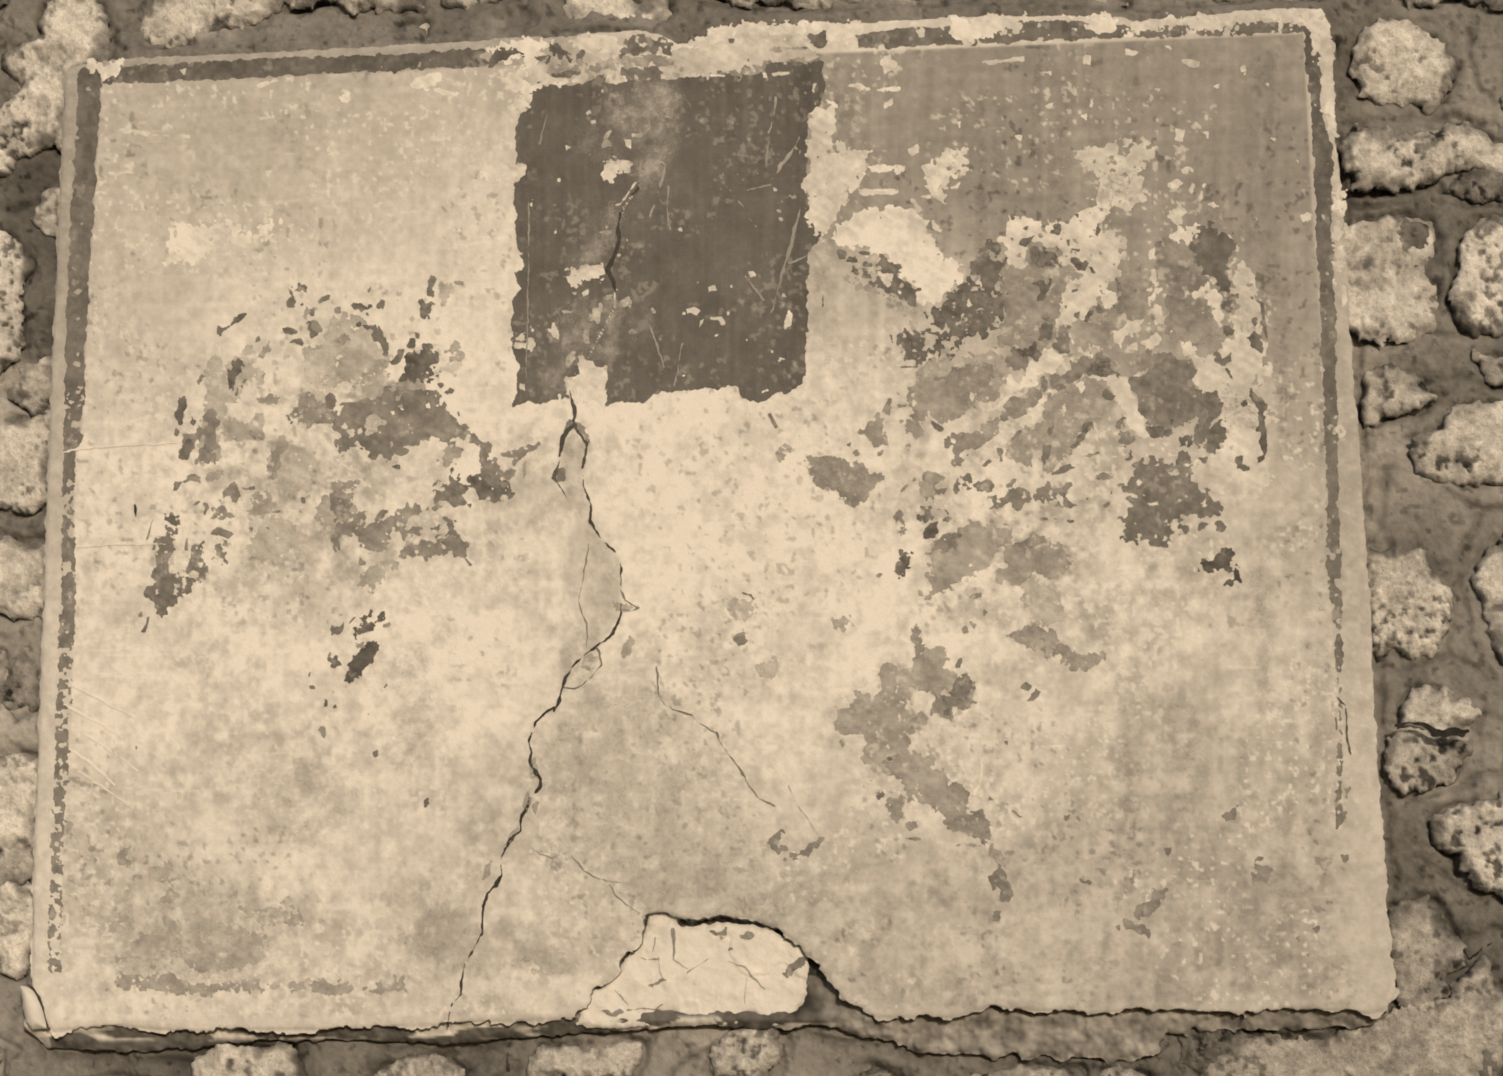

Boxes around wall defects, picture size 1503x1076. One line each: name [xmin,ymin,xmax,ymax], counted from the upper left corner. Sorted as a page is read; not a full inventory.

peeling [485,18,901,118]
peeling [947,11,1029,44]
peeling [1047,8,1340,138]
peeling [586,110,642,206]
crack [605,183,639,304]
peeling [1331,182,1348,307]
peeling [514,254,632,411]
peeling [138,275,541,708]
crack [447,391,818,1027]
peeling [834,623,1014,921]
peeling [105,861,410,998]
flaking render [576,913,810,1029]